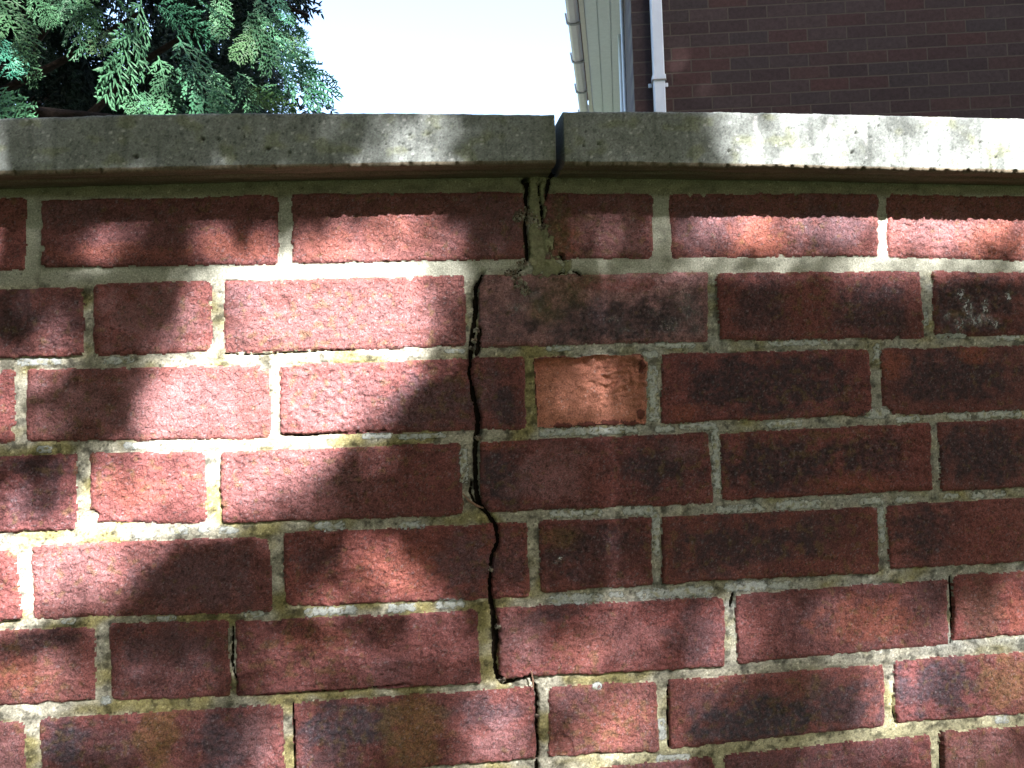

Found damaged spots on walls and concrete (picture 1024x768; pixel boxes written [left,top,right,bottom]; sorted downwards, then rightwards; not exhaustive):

crack [519,172,555,271]
crack [467,274,539,768]